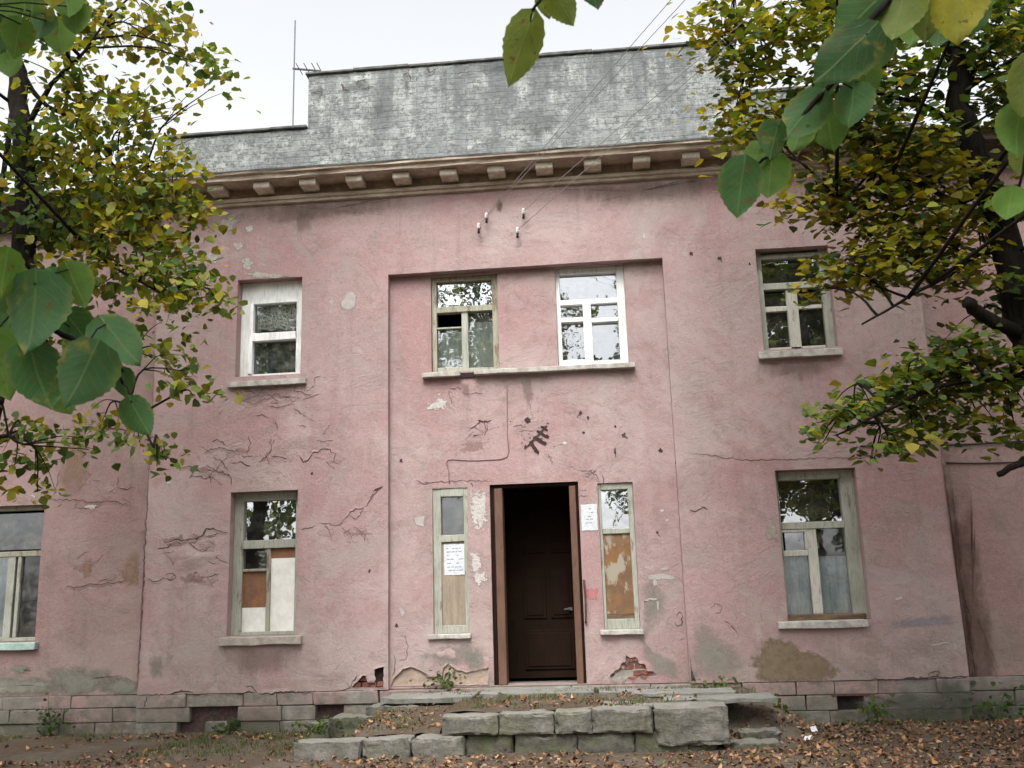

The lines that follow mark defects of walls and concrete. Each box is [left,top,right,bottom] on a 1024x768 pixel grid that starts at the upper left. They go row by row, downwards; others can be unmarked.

peeling [329,291,356,311]
peeling [427,394,450,410]
crack [176,376,339,486]
crack [461,419,495,453]
peeling [510,417,567,454]
crack [302,486,383,543]
peeling [469,489,488,537]
crack [7,460,313,708]
peeling [470,553,487,586]
flaking render [349,662,491,691]
flaking render [607,652,657,684]